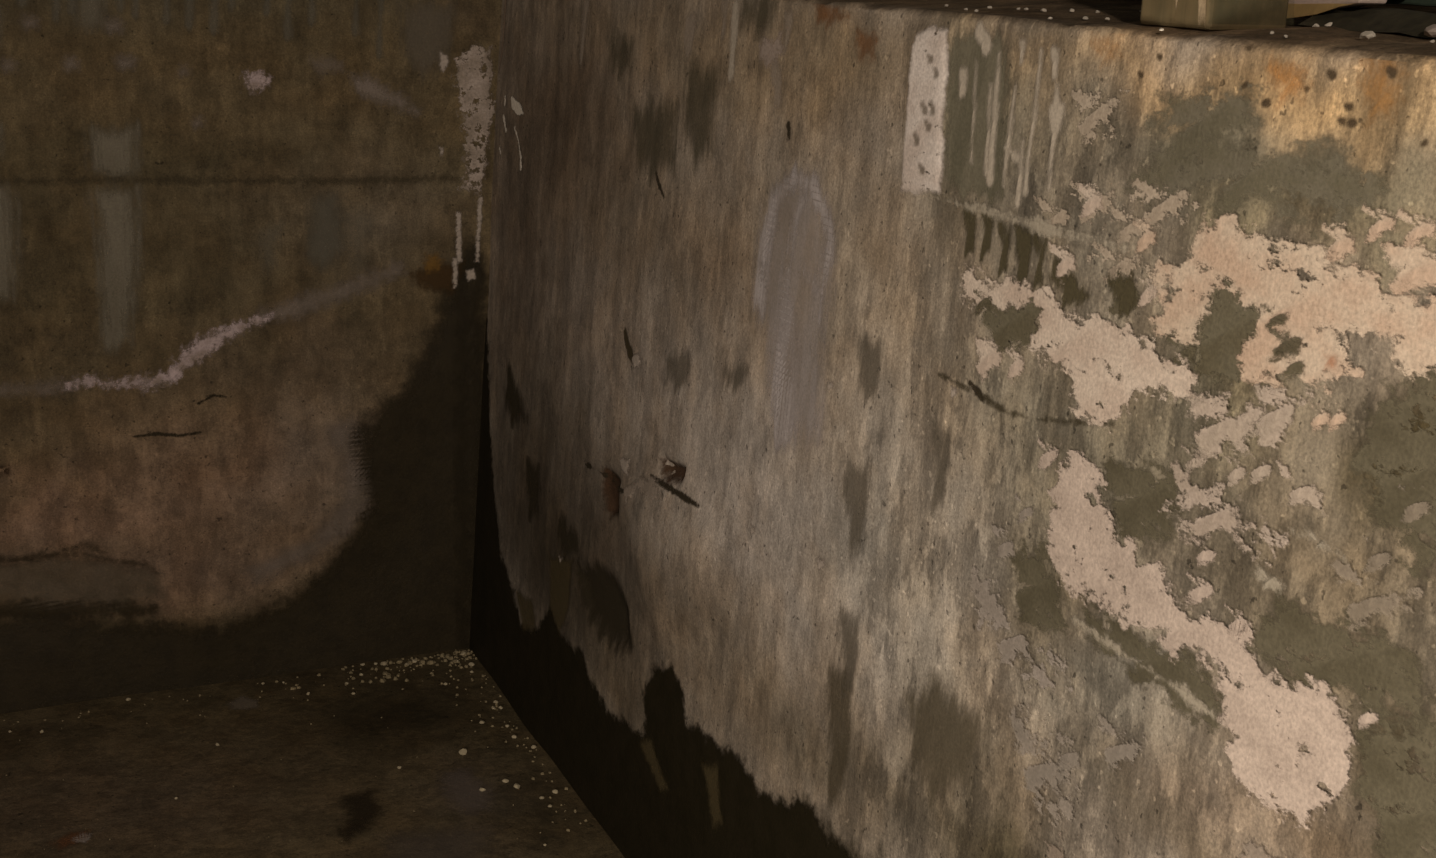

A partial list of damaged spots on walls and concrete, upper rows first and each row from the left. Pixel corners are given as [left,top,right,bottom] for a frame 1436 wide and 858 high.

peeling [901,26,949,194]
peeling [1071,72,1143,145]
damp [860,340,879,396]
crack [938,374,1106,425]
damp [0,244,857,858]
damp [844,467,868,547]
damp [932,425,948,510]
spalling [960,178,1436,858]
damp [906,682,978,799]